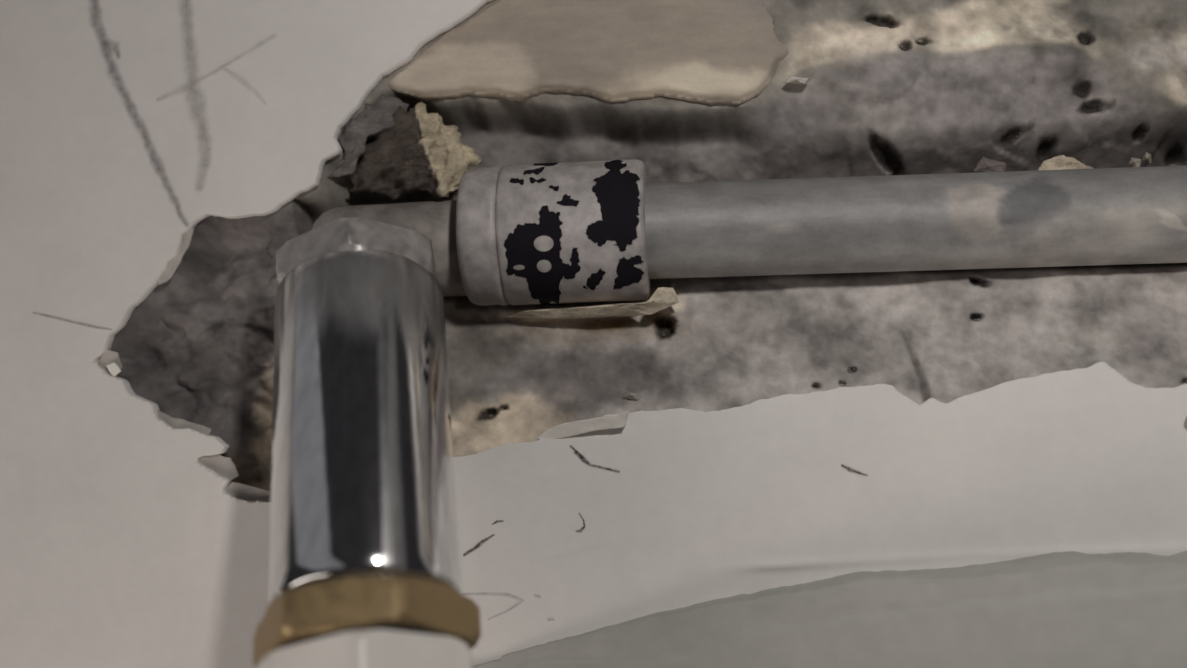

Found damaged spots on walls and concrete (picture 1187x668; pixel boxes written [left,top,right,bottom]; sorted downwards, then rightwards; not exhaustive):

crack [94,6,161,171]
spalling [99,0,1187,501]